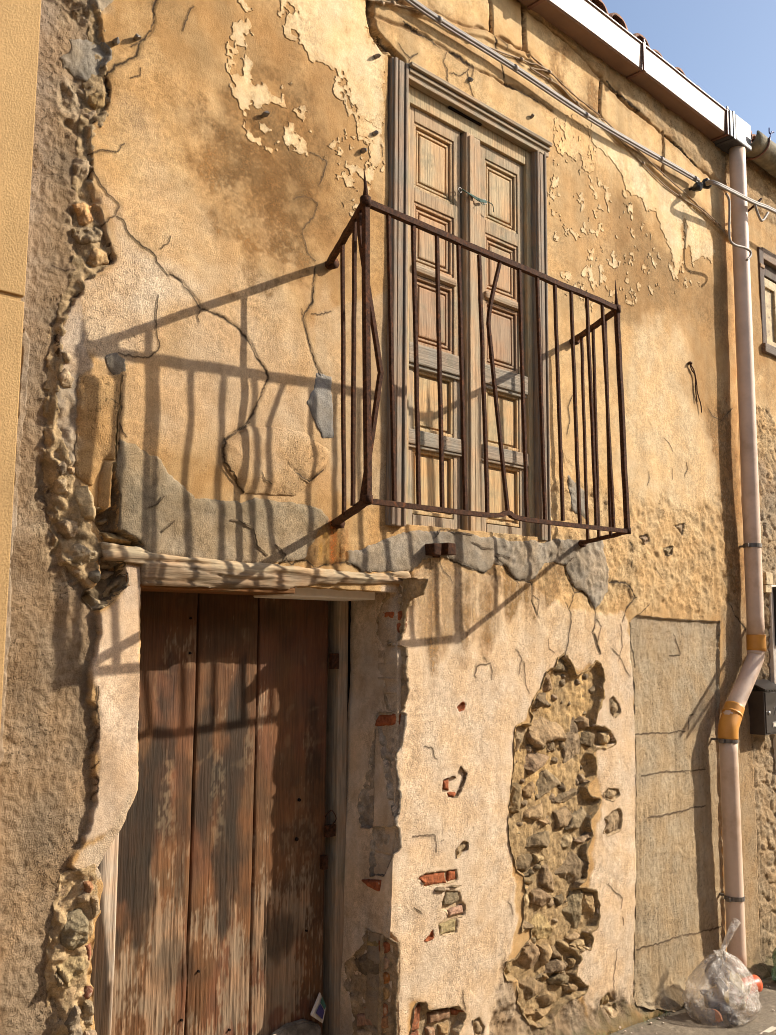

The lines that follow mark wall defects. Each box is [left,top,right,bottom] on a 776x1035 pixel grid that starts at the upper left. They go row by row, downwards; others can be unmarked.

crack [92,0,158,124]
peeling [225,0,312,157]
peeling [277,0,385,217]
crack [87,142,324,493]
crack [293,152,332,376]
peeling [547,113,716,311]
crack [231,519,361,572]
crack [430,528,663,676]
crack [635,713,693,736]
flaking render [418,840,469,942]
flaking render [503,652,623,1028]
flaking render [343,928,485,1035]